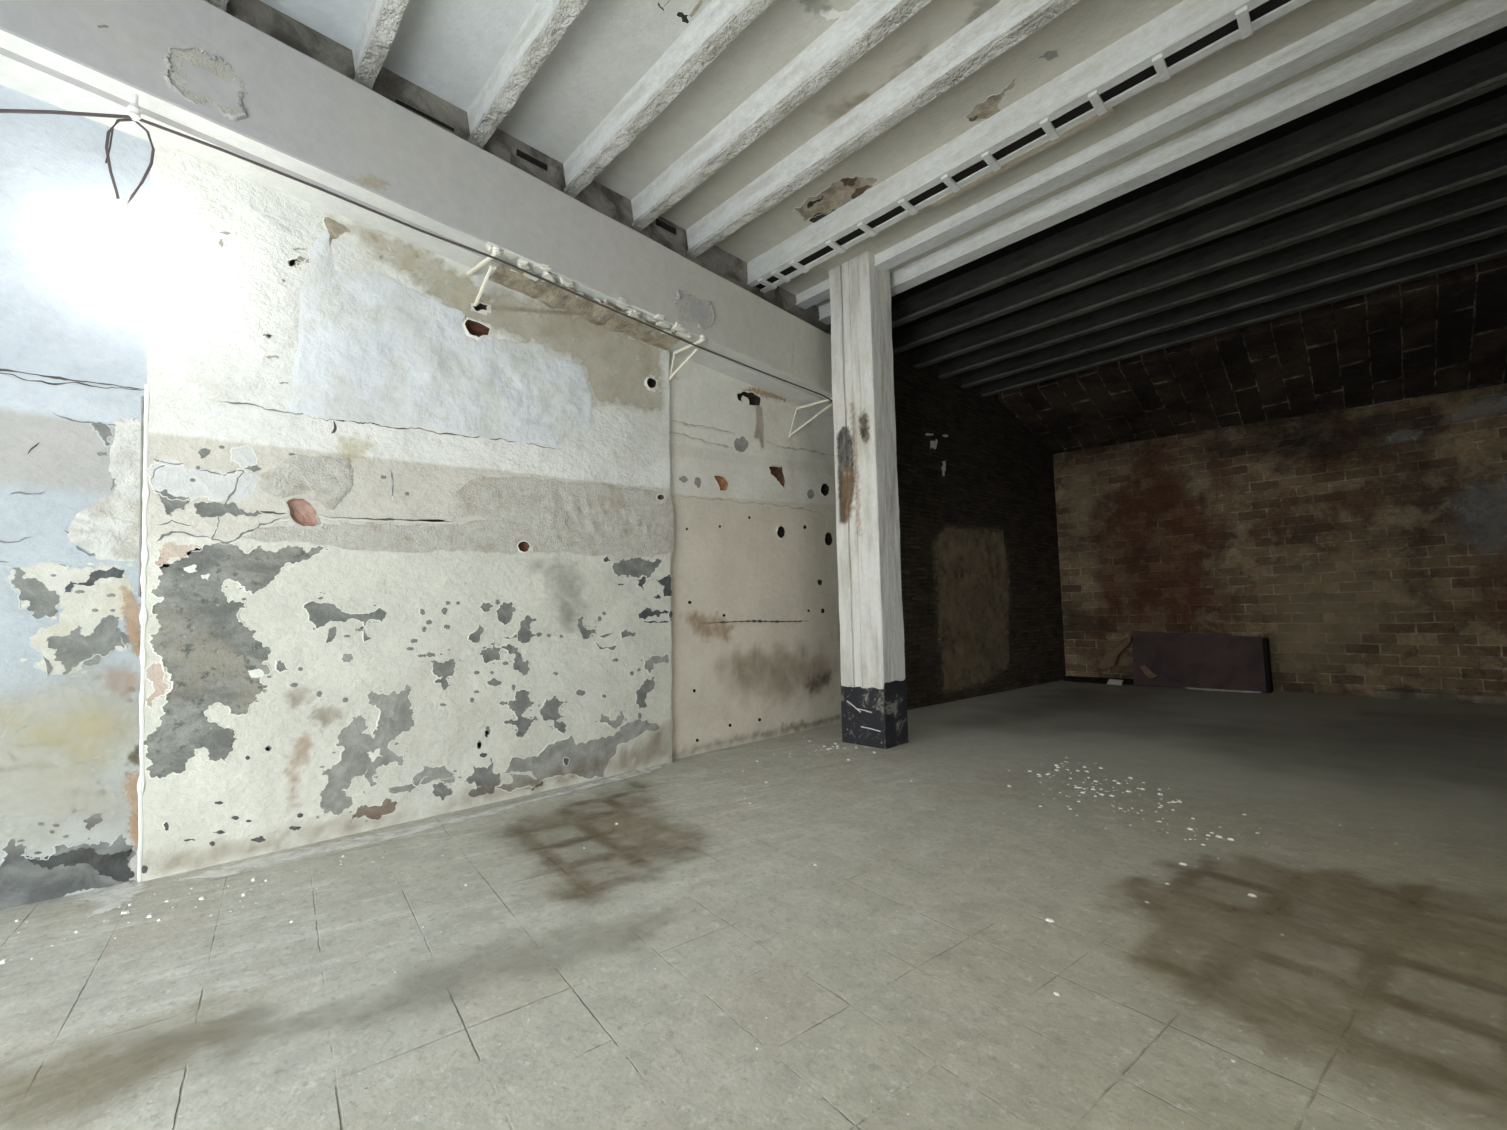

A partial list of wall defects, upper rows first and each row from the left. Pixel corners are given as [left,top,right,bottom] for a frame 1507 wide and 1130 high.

flaking render [793,176,878,223]
flaking render [462,302,505,342]
flaking render [485,244,691,351]
crack [0,369,145,426]
crack [9,489,44,497]
peeling [143,445,262,518]
crack [152,459,289,545]
corrosion [842,471,852,520]
crack [59,530,95,567]
peeling [0,541,329,780]
peeling [289,554,673,831]
flaking render [0,810,148,910]